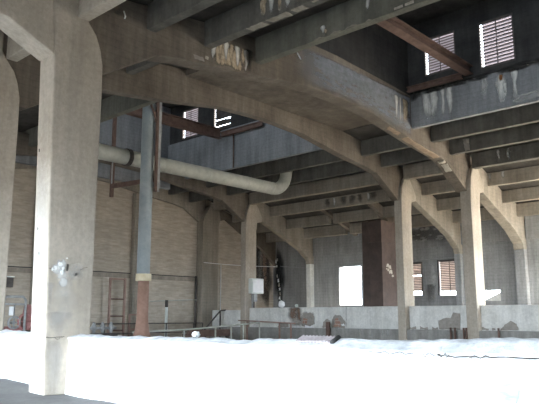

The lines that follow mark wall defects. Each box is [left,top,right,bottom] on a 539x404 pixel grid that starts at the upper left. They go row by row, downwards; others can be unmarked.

damp [497,74,506,98]
damp [423,87,452,113]
peeling [52,257,80,286]
peeling [301,312,315,328]
peeling [322,315,346,328]
peeling [410,312,461,330]
peeling [482,321,519,331]